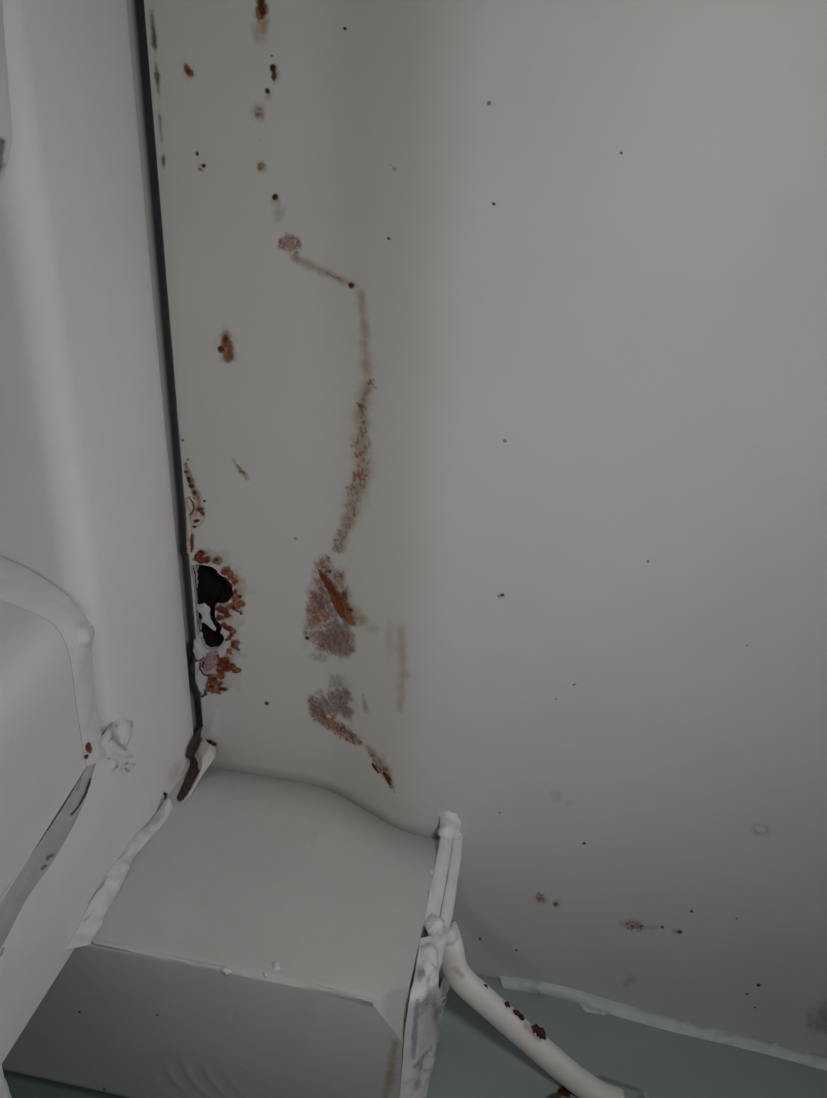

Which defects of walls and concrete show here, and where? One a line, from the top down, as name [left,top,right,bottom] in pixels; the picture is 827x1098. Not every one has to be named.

corrosion [256,0,267,30]
corrosion [218,336,233,362]
corrosion [184,459,245,694]
corrosion [305,550,354,656]
spalling [192,565,234,698]
corrosion [308,689,362,744]
corrosion [504,1002,546,1040]